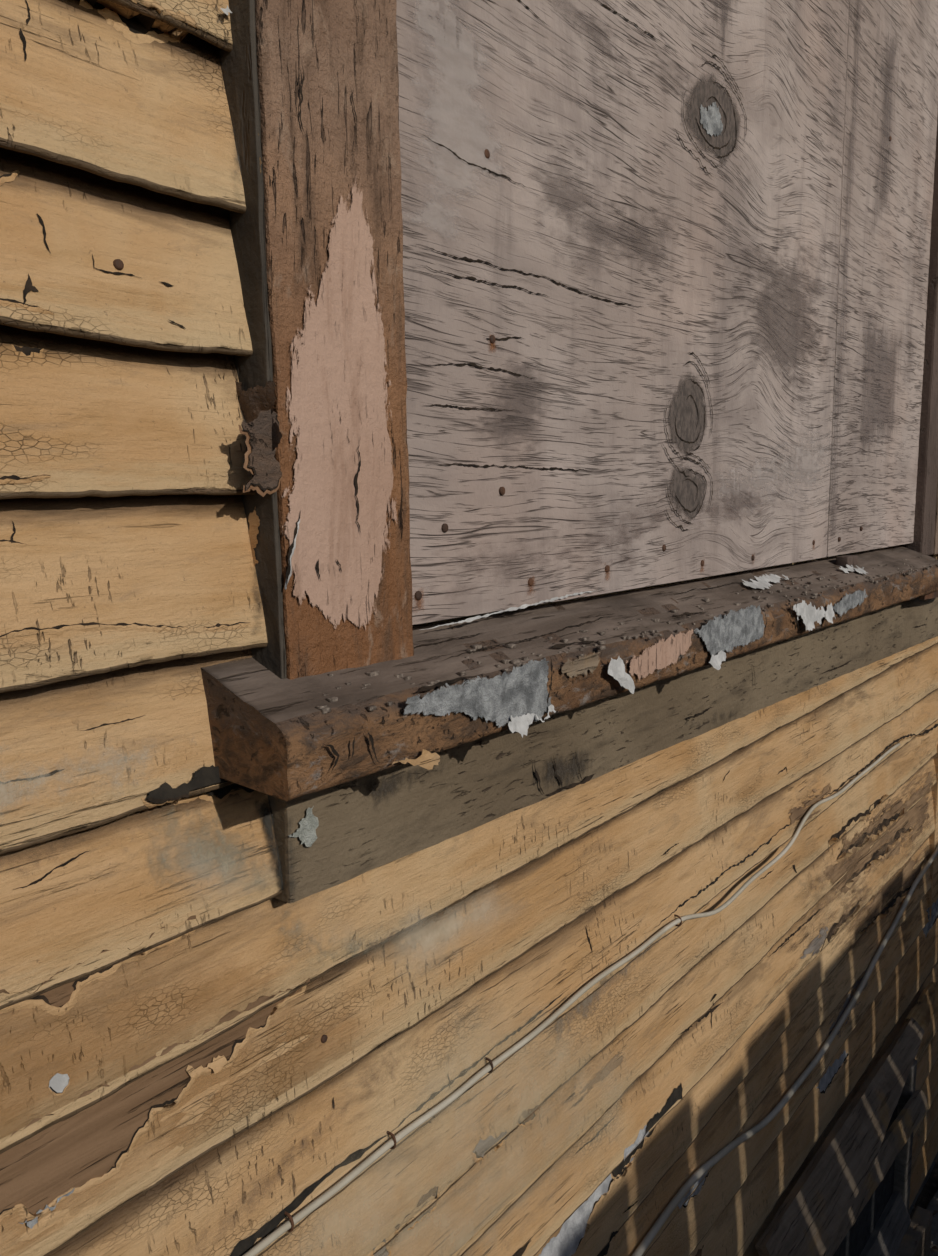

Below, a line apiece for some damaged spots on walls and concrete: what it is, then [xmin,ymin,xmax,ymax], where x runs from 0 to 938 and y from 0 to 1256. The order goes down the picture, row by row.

crack [19,0,31,61]
crack [37,214,51,253]
crack [0,274,54,315]
crack [92,255,173,287]
peeling [235,162,397,629]
peeling [793,564,867,631]
crack [0,622,250,642]
peeling [404,604,765,738]
crack [769,724,938,966]
crack [681,994,721,1034]
peeling [0,978,310,1229]
peeling [539,1124,658,1256]